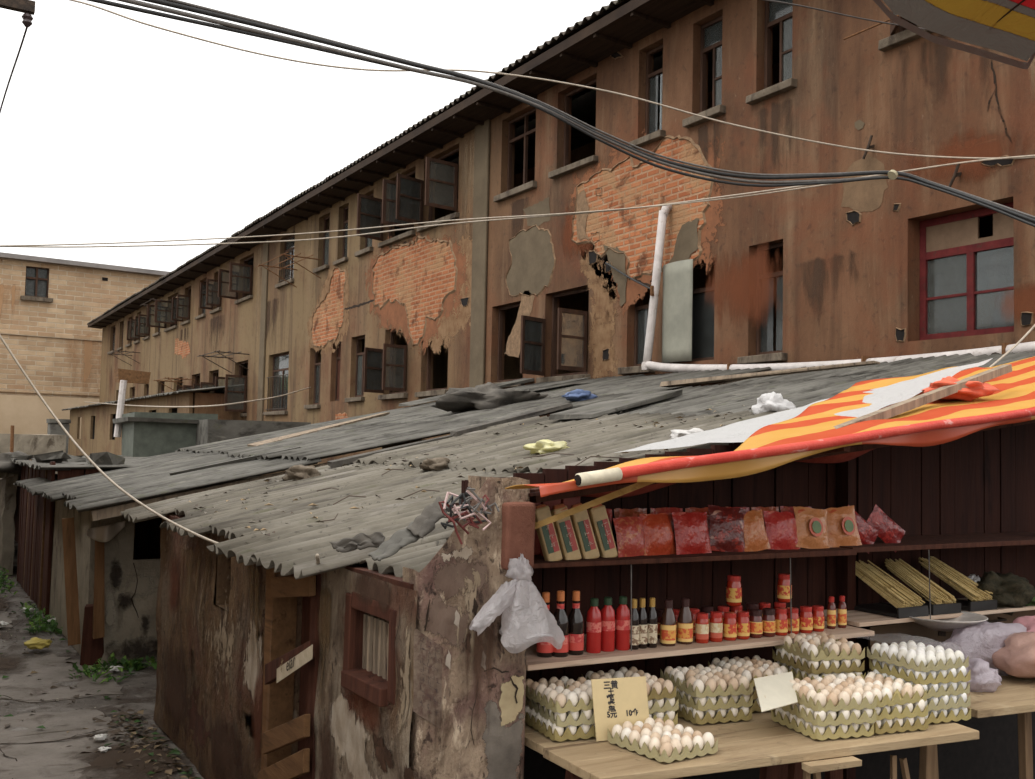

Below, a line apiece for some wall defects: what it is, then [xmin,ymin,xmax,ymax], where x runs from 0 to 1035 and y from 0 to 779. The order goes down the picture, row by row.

crack [987,62,1012,143]
spalling [307,263,350,354]
spalling [364,228,473,354]
spalling [569,129,728,379]
spalling [433,548,492,628]